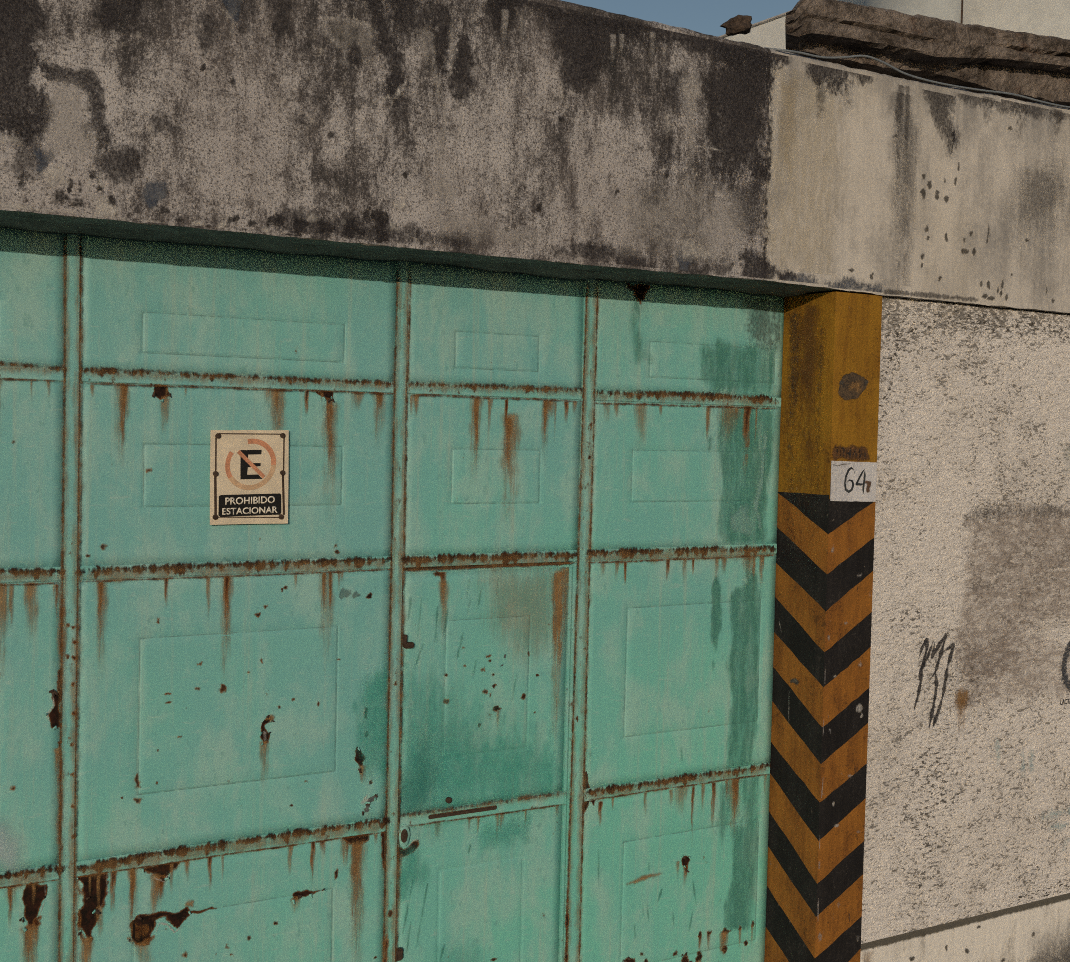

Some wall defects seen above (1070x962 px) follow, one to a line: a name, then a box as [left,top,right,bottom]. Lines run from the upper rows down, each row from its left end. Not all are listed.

damp [0,0,55,145]
damp [198,14,215,48]
damp [94,147,139,183]
damp [277,205,538,246]
damp [368,0,1070,423]
rust [0,239,776,962]